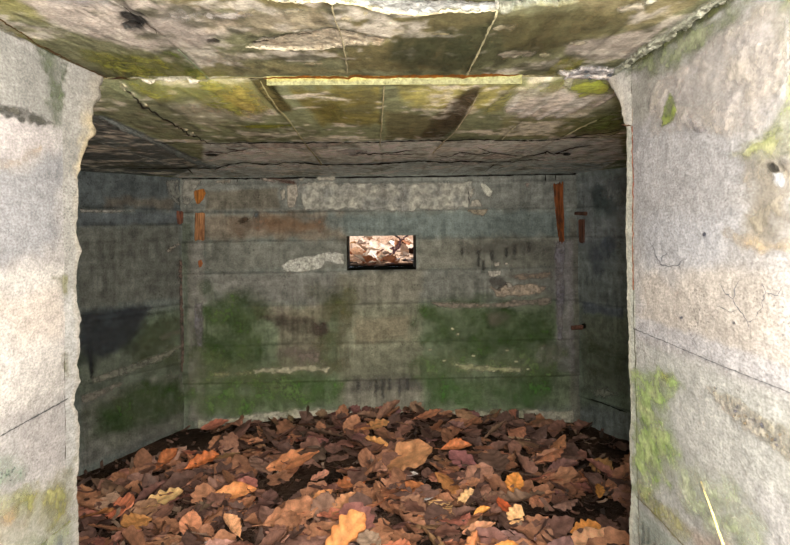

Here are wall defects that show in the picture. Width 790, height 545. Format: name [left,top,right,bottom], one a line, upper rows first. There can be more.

spalling [268,0,566,17]
peeling [506,0,727,119]
spalling [282,252,344,272]
peeling [280,176,492,216]
crack [0,19,790,442]
water stain [80,305,181,402]